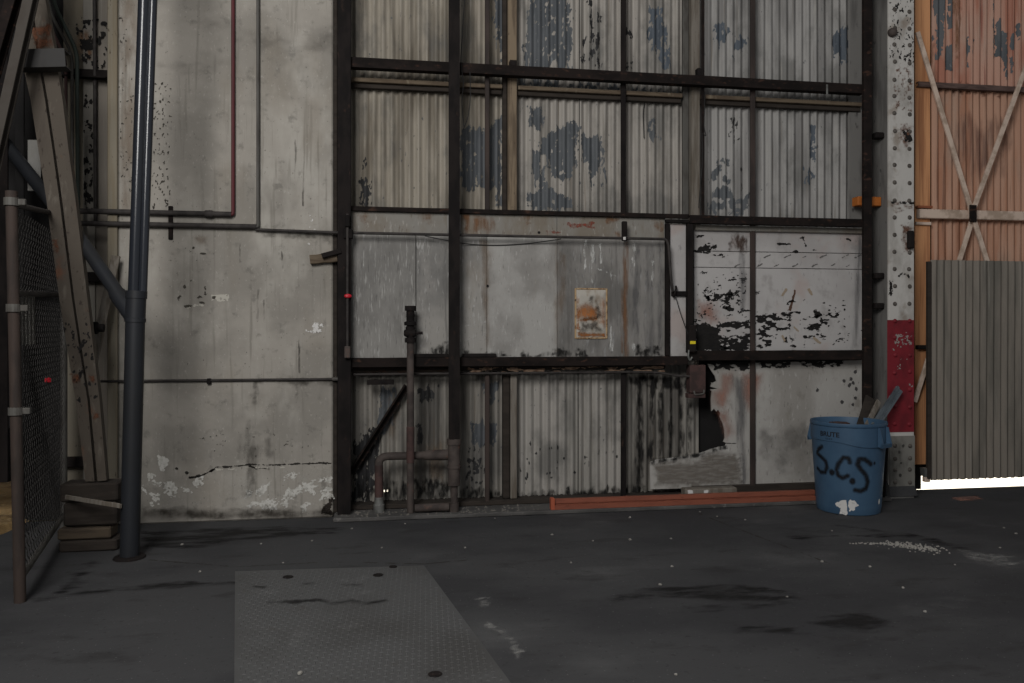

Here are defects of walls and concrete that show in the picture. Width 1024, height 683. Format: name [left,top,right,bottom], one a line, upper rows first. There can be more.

peeling [518,0,681,93]
peeling [889,0,915,62]
peeling [932,0,953,71]
peeling [993,3,1021,80]
peeling [460,115,502,208]
peeling [526,105,607,211]
peeling [693,235,723,256]
peeling [694,271,862,371]
peeling [141,455,204,507]
crack [175,462,331,479]
peeling [245,471,335,516]